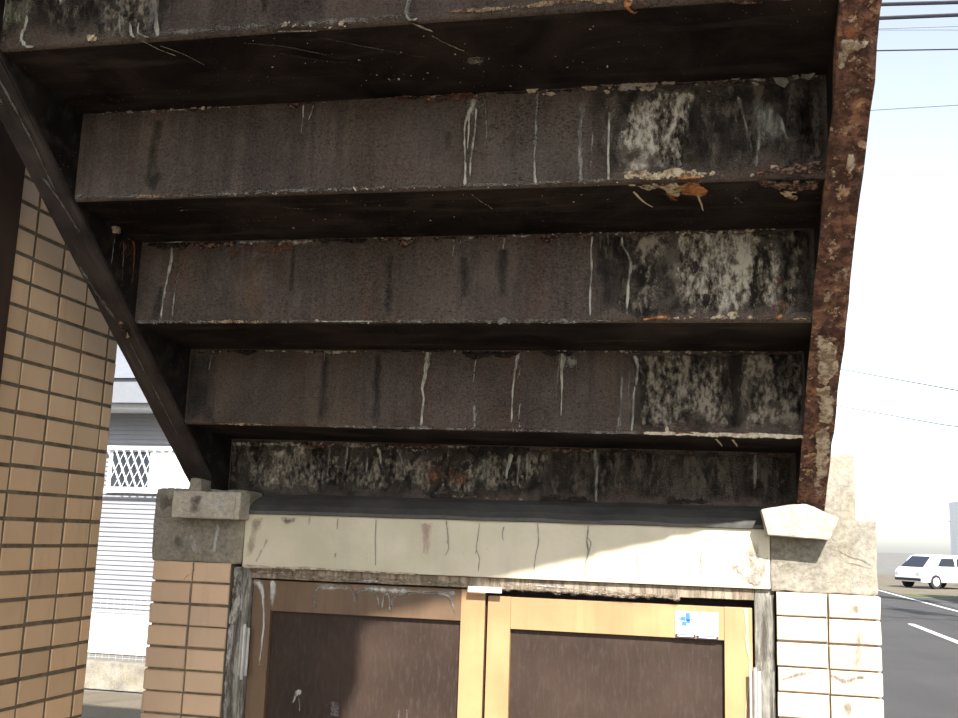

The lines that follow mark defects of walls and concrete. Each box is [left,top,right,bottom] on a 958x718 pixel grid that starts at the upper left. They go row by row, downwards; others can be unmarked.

damp [4,0,33,48]
peeling [3,0,116,31]
damp [86,0,204,65]
damp [463,94,487,186]
damp [737,97,787,164]
corrosion [750,161,825,200]
damp [420,352,432,426]
damp [510,353,521,429]
damp [556,354,577,413]
damp [617,355,639,432]
crack [584,527,592,578]
peeling [732,547,768,586]